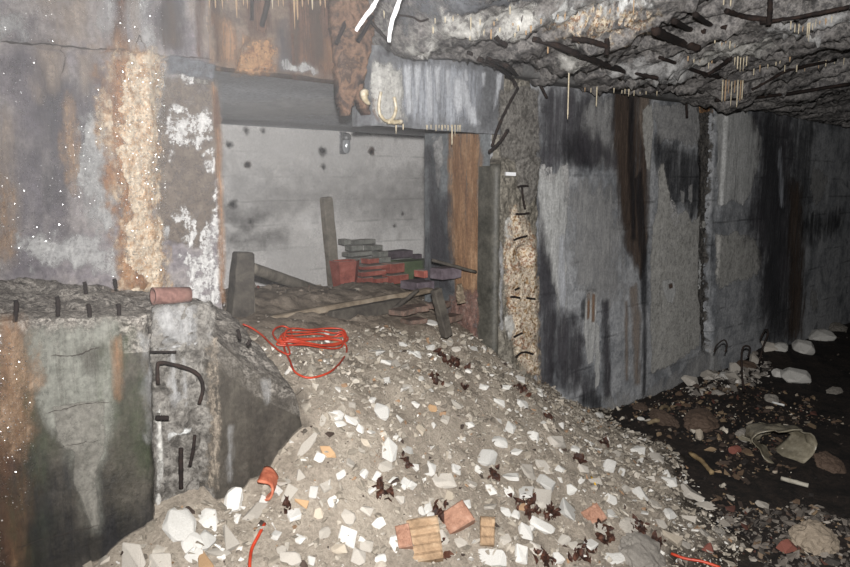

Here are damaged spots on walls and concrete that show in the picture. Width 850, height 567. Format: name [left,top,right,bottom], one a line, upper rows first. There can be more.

crack [1,35,215,76]
rust [287,0,404,123]
spalling [334,0,429,46]
spalling [532,36,659,80]
spalling [651,11,727,52]
spalling [724,0,850,26]
damp [155,59,221,248]
spalling [502,155,541,383]
damp [537,88,719,409]
damp [750,111,841,341]
peeling [26,281,121,530]
damp [101,520,129,557]